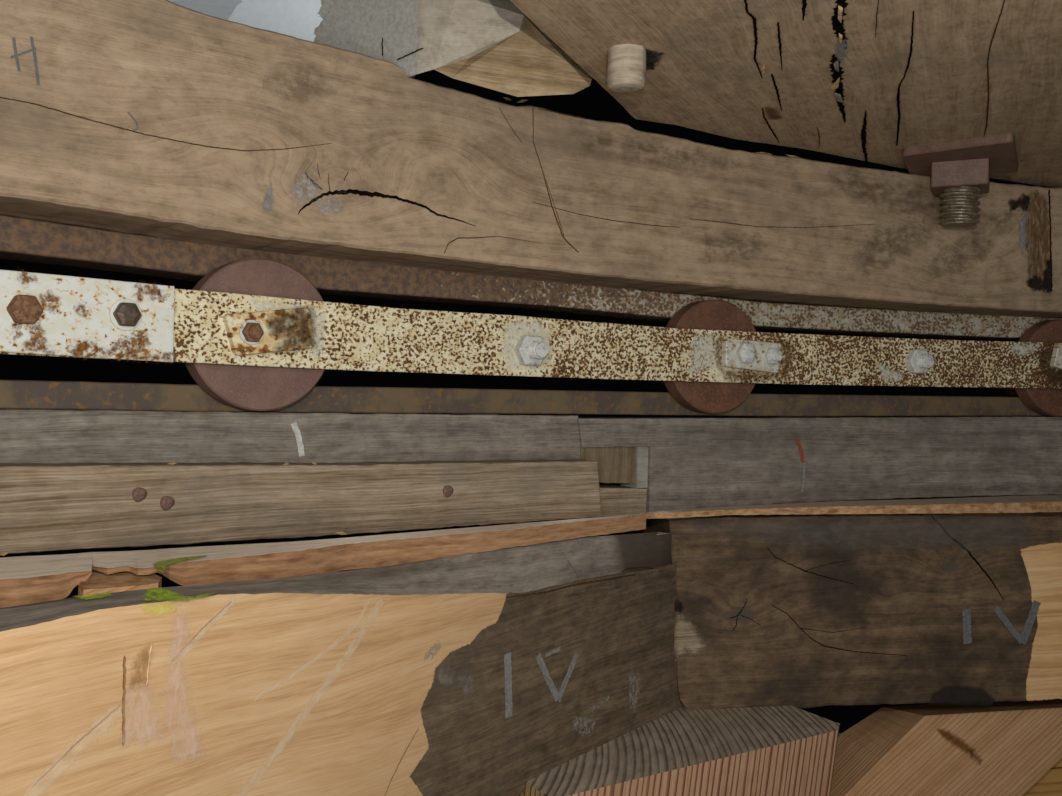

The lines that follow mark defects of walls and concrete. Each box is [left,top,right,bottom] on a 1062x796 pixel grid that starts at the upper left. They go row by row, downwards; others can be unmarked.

crack [744,0,807,143]
crack [829,0,868,163]
crack [896,11,914,146]
crack [984,0,1005,136]
crack [0,97,871,253]
corrosion [14,323,54,355]
corrosion [70,331,173,360]
corrosion [135,285,162,300]
corrosion [268,309,314,349]
corrosion [716,337,794,380]
damp [1009,191,1052,293]
corrosion [1039,342,1062,387]